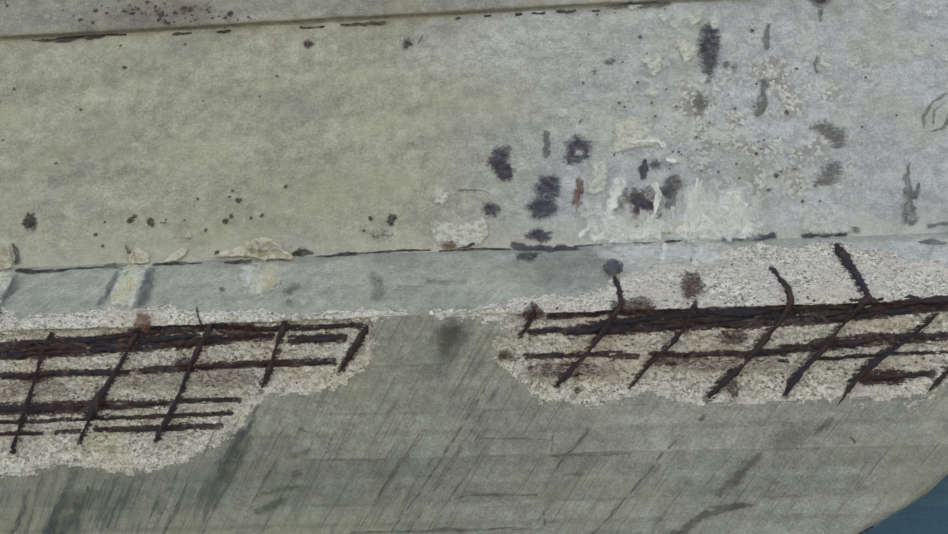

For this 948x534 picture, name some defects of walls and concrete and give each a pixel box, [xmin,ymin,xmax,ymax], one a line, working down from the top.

damp [698,24,737,83]
damp [692,92,709,115]
crack [922,94,948,131]
damp [543,130,551,158]
damp [0,135,776,308]
spalling [0,185,948,478]